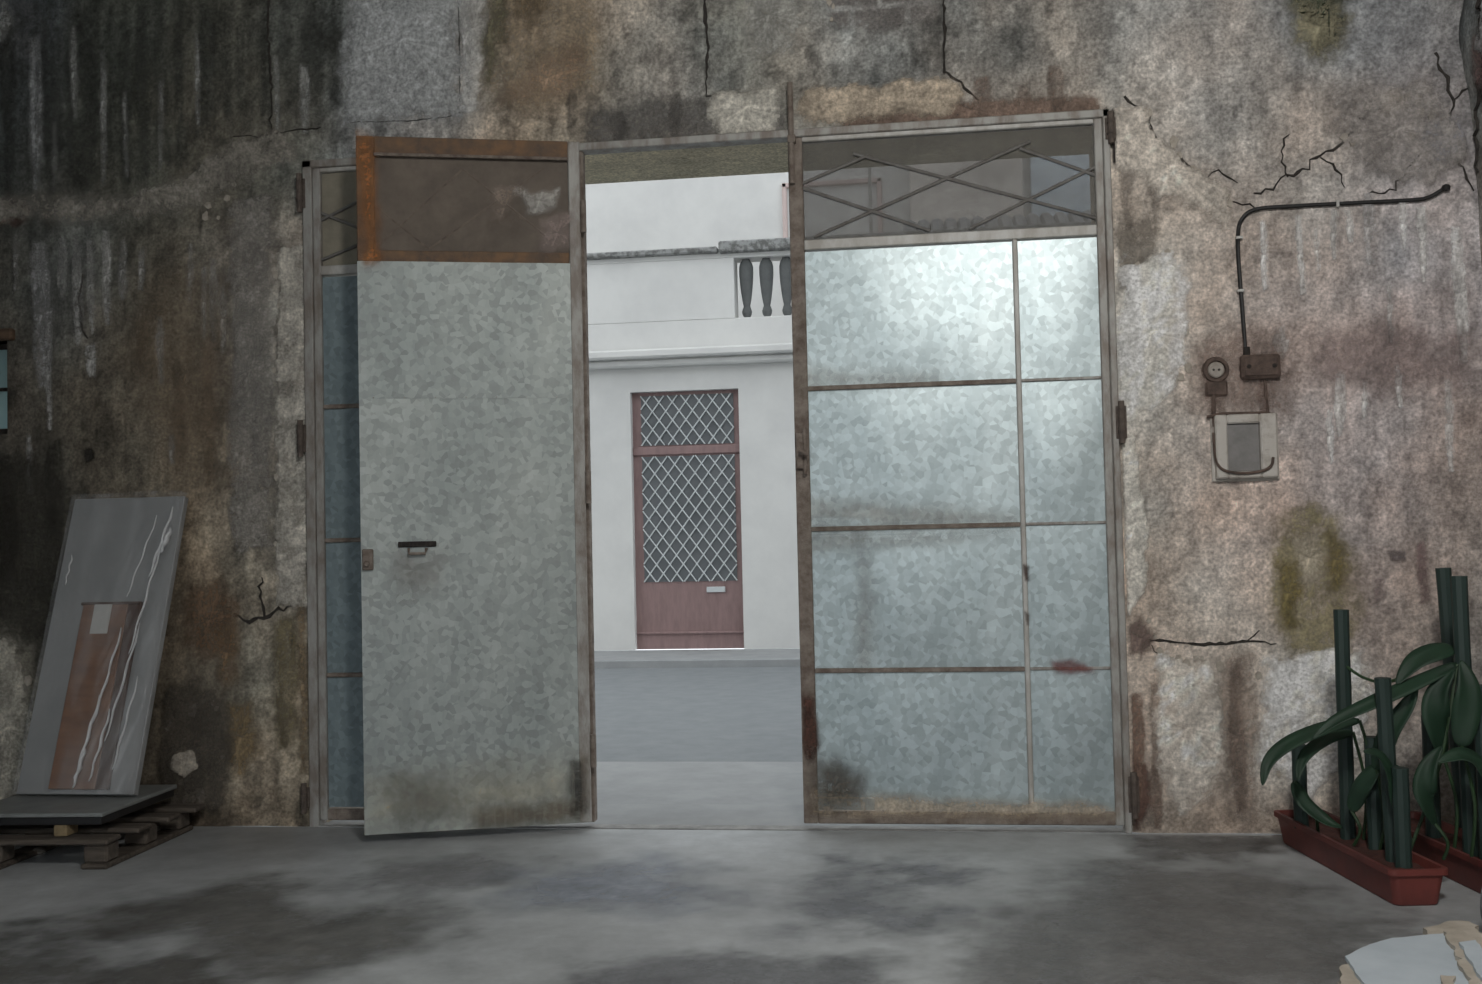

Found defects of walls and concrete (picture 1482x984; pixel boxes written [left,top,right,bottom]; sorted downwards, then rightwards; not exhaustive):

leakage [0,0,250,186]
crack [703,0,739,97]
spalling [797,76,963,124]
crack [942,0,978,100]
crack [1124,0,1482,208]
leakage [1295,0,1348,60]
corrosion [495,187,556,218]
leakage [0,232,142,644]
crack [233,577,293,624]
leakage [1280,533,1344,626]